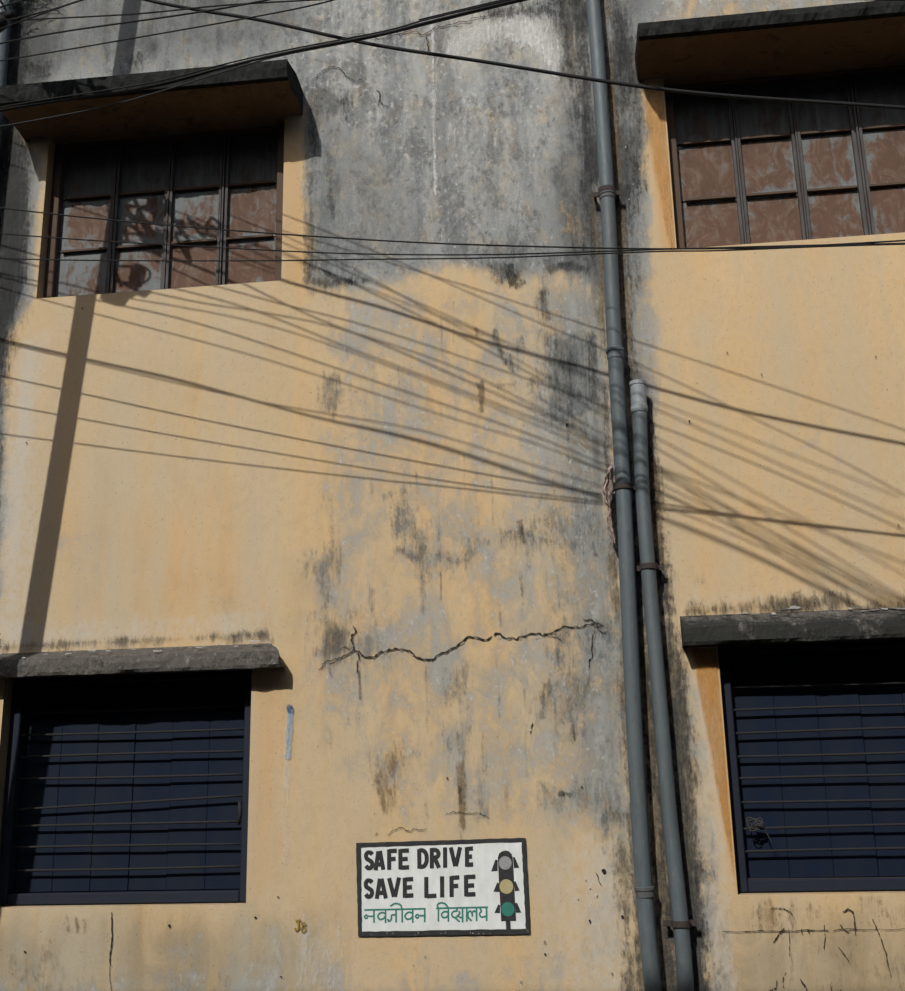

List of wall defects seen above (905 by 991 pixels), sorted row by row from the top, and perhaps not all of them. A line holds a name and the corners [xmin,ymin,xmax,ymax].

water stain [0,116,30,385]
water stain [489,249,526,288]
water stain [446,0,603,273]
crack [318,619,607,674]
water stain [632,500,678,991]
water stain [647,398,709,991]
water stain [621,936,645,991]